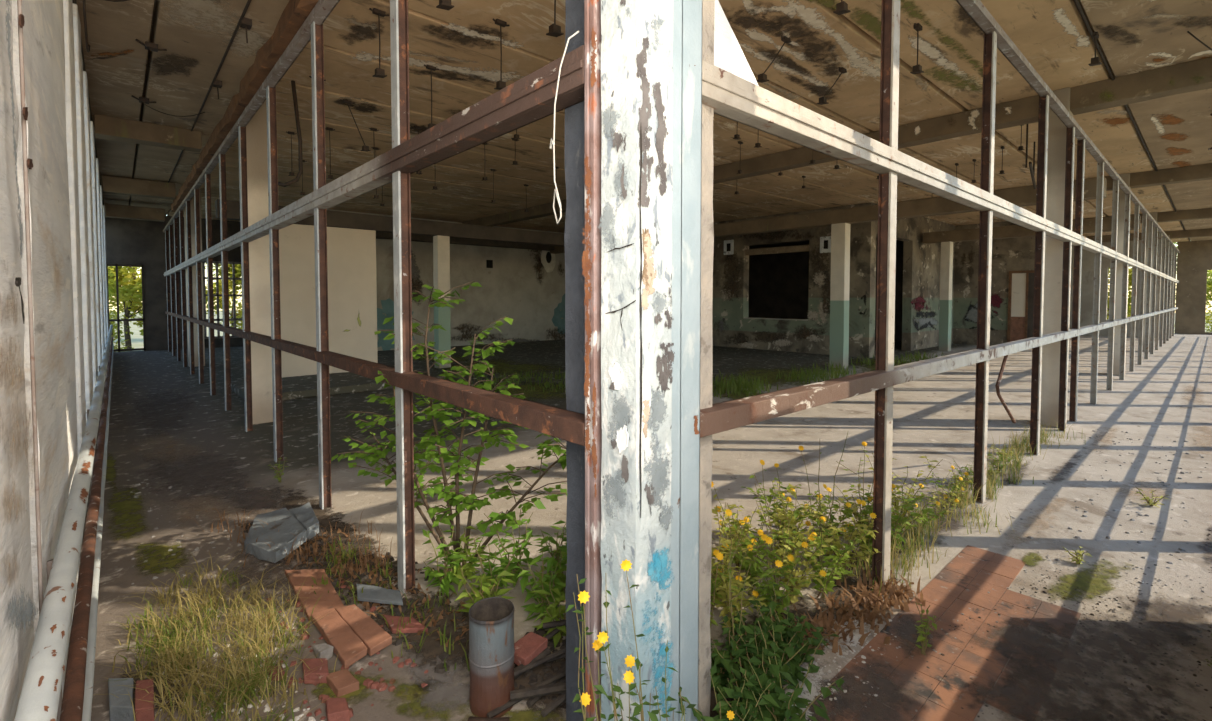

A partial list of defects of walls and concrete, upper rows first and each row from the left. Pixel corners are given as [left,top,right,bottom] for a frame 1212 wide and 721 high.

damp [147,54,198,75]
damp [168,0,266,56]
damp [344,18,391,61]
damp [409,23,524,83]
rust [588,27,597,88]
damp [722,0,881,99]
peeling [599,19,669,250]
damp [740,230,831,314]
rust [581,156,597,498]
peeling [603,228,675,530]
rust [78,436,96,504]
rust [38,624,65,691]